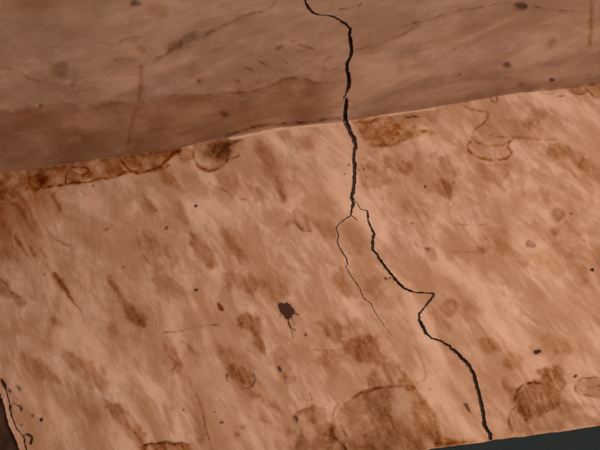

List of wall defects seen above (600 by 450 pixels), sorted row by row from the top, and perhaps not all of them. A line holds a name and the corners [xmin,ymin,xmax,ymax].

damp [278,302,298,330]
crack [304,0,493,440]